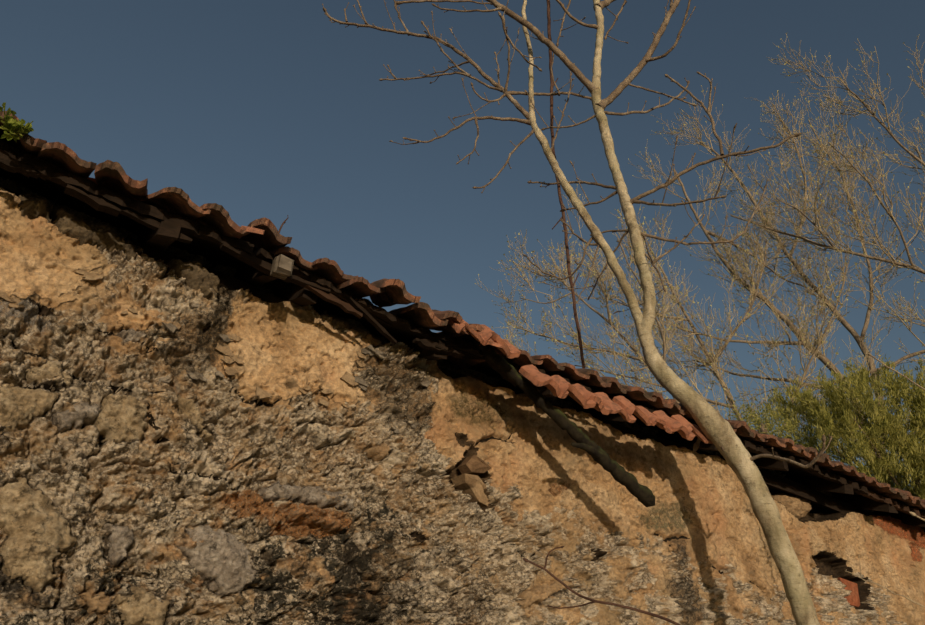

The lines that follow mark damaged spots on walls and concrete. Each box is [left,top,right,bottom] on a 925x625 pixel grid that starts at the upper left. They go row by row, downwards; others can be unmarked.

flaking render [113,301,436,434]
crack [475,434,516,446]
spalling [445,432,496,513]
spalling [409,531,429,544]
water stain [665,578,708,625]
spalling [812,551,875,610]